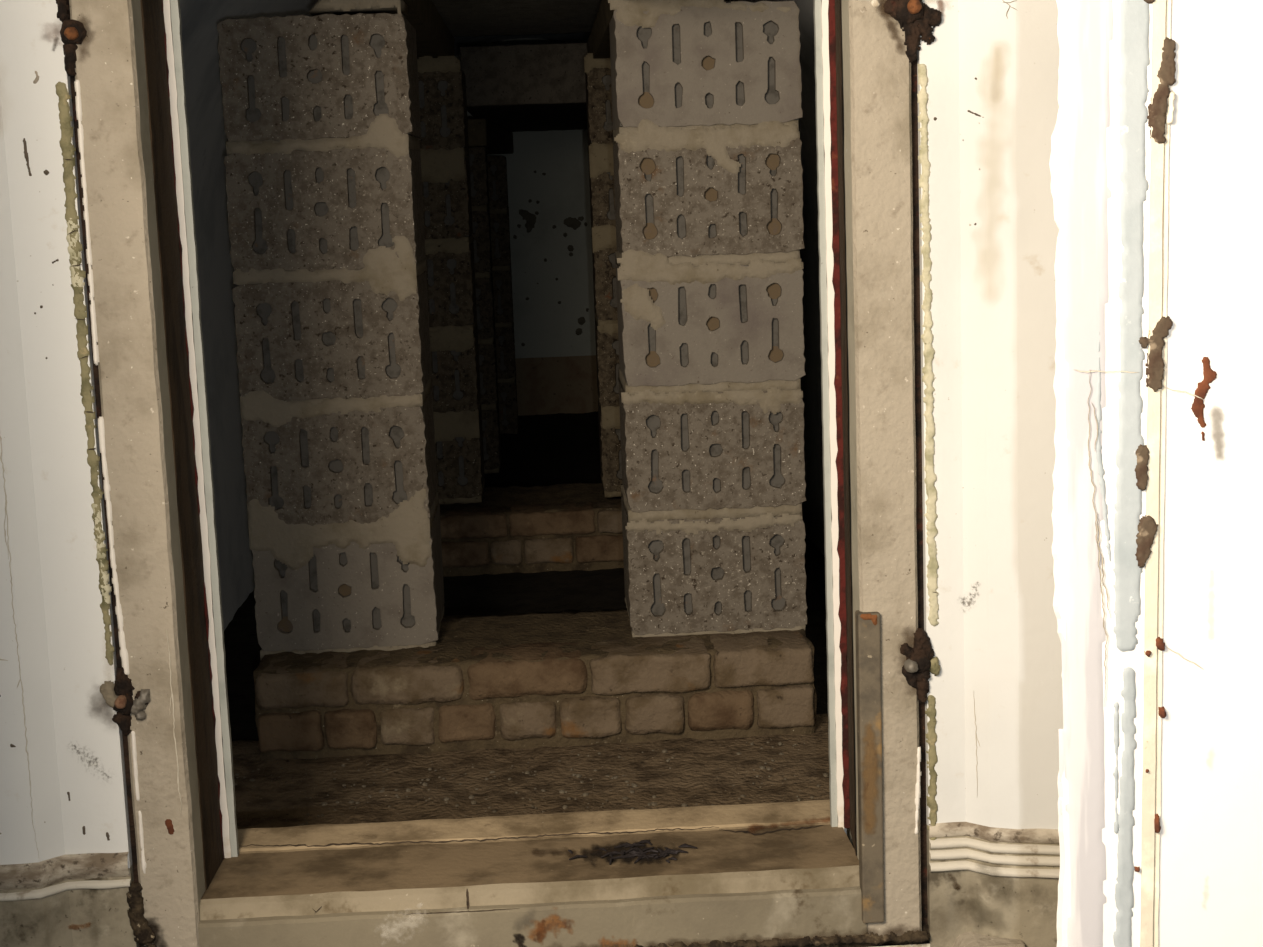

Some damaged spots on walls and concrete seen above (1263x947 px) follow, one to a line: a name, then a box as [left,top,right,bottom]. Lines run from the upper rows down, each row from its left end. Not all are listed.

rust [1191,357,1222,457]
peeling [1058,0,1150,947]
rust [513,916,570,947]